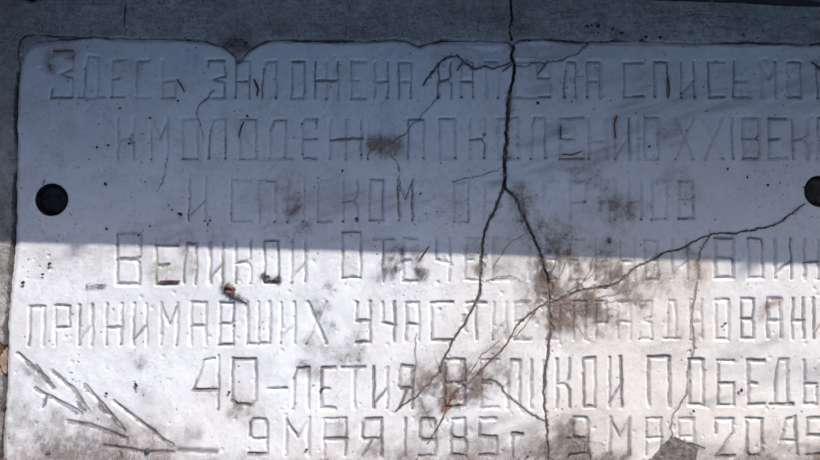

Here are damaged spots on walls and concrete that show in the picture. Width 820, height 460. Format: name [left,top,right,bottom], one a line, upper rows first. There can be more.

crack [392,0,805,460]